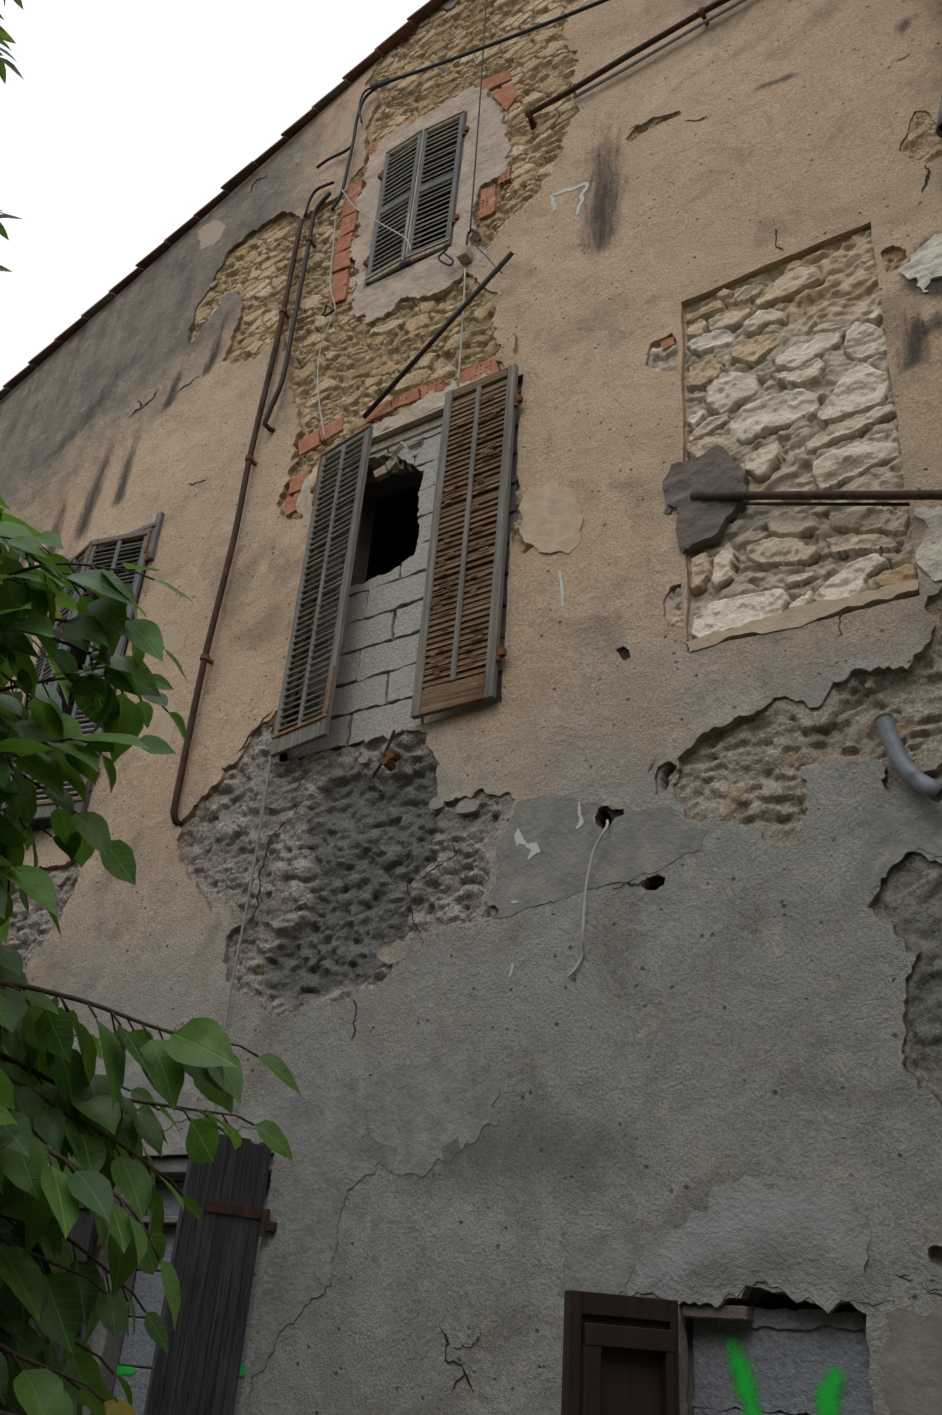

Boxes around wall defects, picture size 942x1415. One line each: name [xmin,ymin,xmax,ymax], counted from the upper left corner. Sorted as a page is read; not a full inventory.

spalling [900,112,942,164]
spalling [190,0,589,521]
spalling [882,248,907,272]
spalling [180,586,942,1104]
spalling [0,860,80,991]
flaking render [120,1052,500,1415]
spalling [931,1246,942,1266]
crack [439,1324,481,1390]